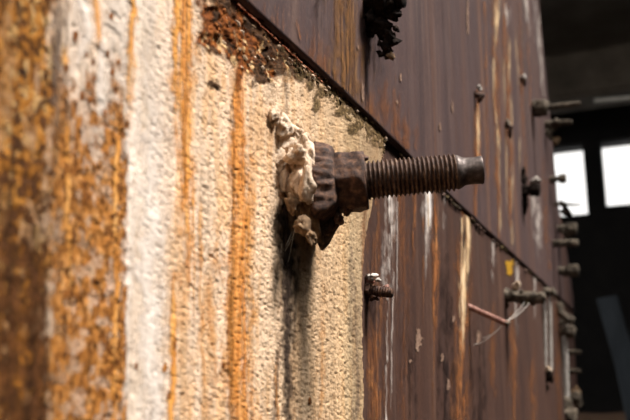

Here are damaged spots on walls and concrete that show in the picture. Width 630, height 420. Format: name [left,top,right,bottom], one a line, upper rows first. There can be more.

corrosion [0,0,130,420]
corrosion [127,0,137,84]
corrosion [162,286,177,420]
corrosion [171,0,202,271]
corrosion [222,84,254,420]
leakage [275,202,298,420]
spalling [196,0,387,158]
corrosion [324,0,362,98]
leakage [388,195,398,250]
leakage [425,191,439,324]
corrosion [454,202,476,420]